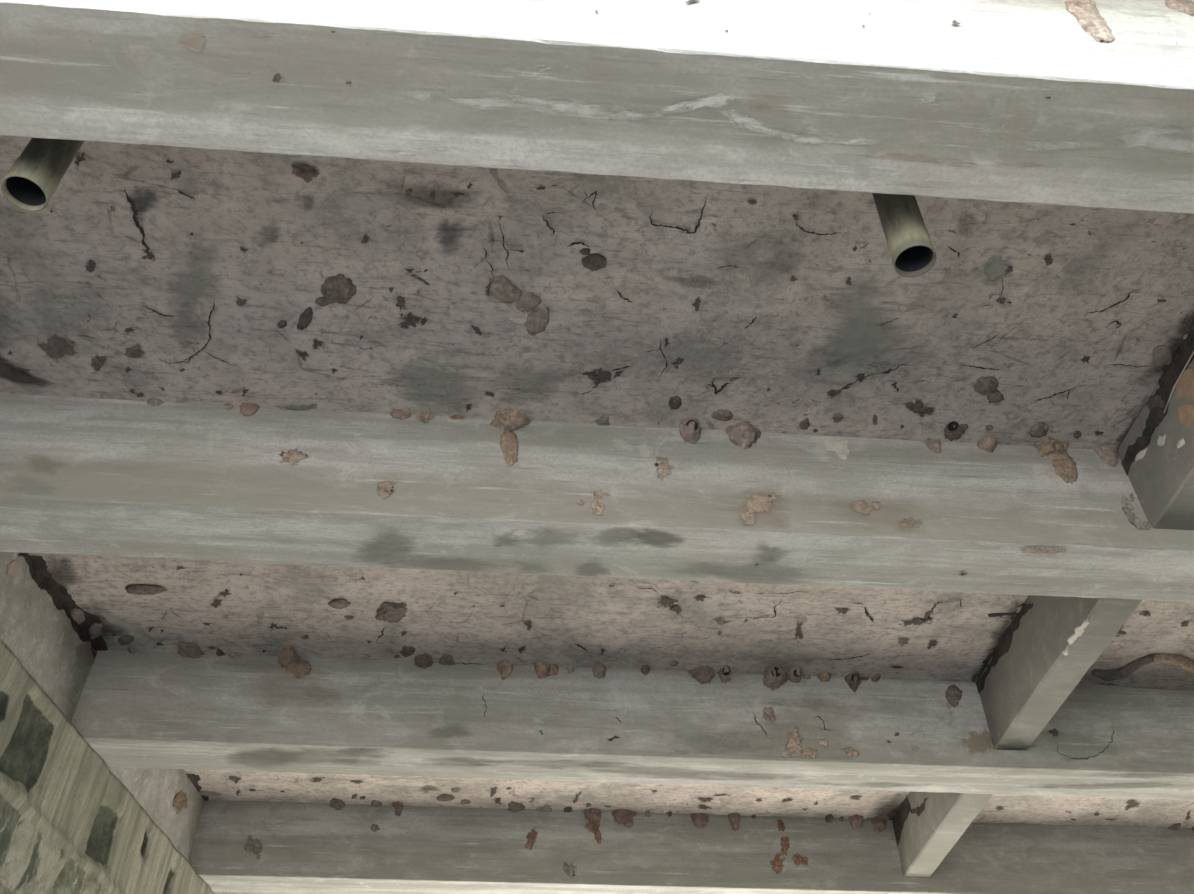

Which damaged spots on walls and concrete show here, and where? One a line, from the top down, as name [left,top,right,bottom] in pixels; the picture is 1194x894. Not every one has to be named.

crack [124,187,150,253]
crack [649,199,707,234]
crack [795,219,841,236]
crack [159,298,230,369]
damp [0,359,49,386]
crack [832,362,927,395]
spalling [18,553,164,666]
damp [239,749,373,764]
crack [1054,725,1114,759]